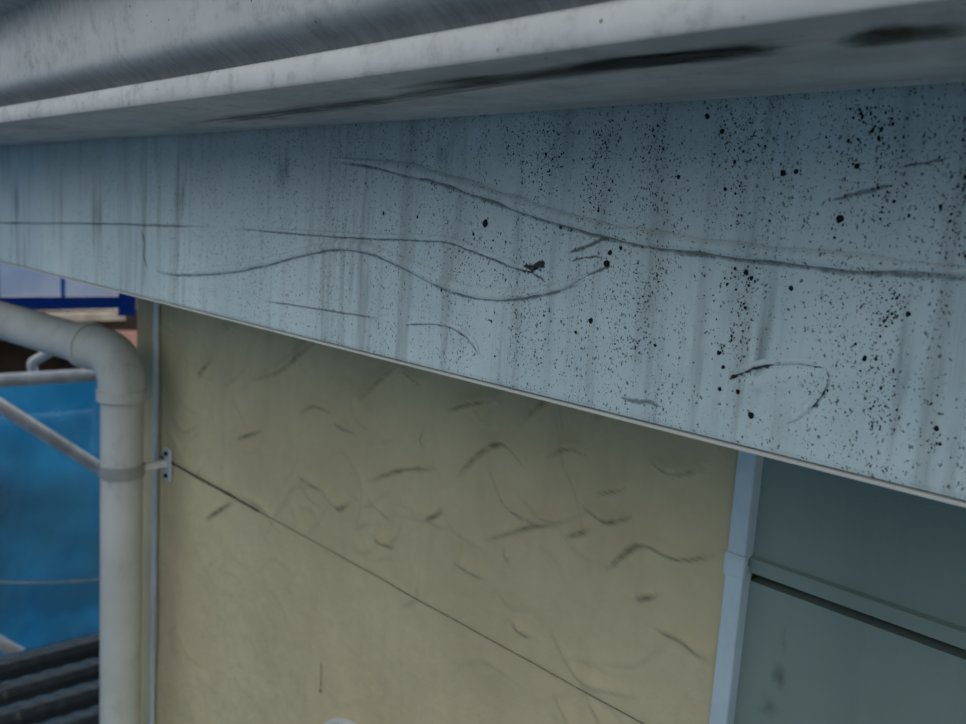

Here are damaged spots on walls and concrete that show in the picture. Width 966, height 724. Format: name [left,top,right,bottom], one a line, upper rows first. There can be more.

leakage [504,123,567,200]
crack [142,157,966,301]
leakage [581,120,623,213]
leakage [640,117,680,213]
leakage [708,113,798,231]
leakage [830,105,913,230]
leakage [930,136,966,266]
crack [405,319,480,355]
leakage [603,246,675,357]
leakage [704,266,761,394]
leakage [826,276,913,431]
crack [160,455,644,724]